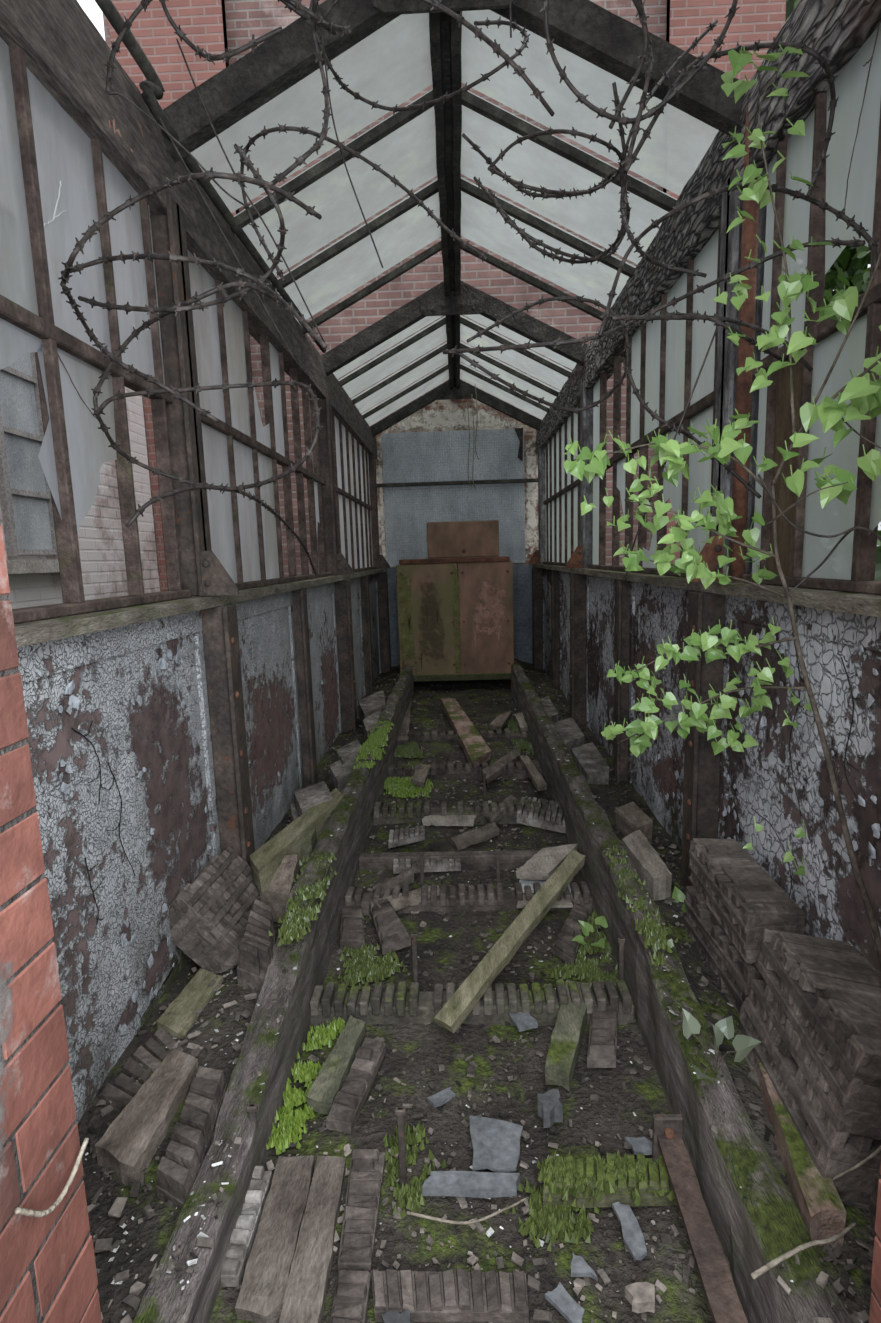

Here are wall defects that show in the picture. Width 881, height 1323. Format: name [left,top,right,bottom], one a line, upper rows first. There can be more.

peeling [58,680,80,715]
peeling [116,627,213,1035]
peeling [245,663,299,816]
peeling [632,638,680,801]
peeling [718,620,787,842]
peeling [812,737,840,817]
peeling [829,613,881,708]
peeling [847,793,881,867]